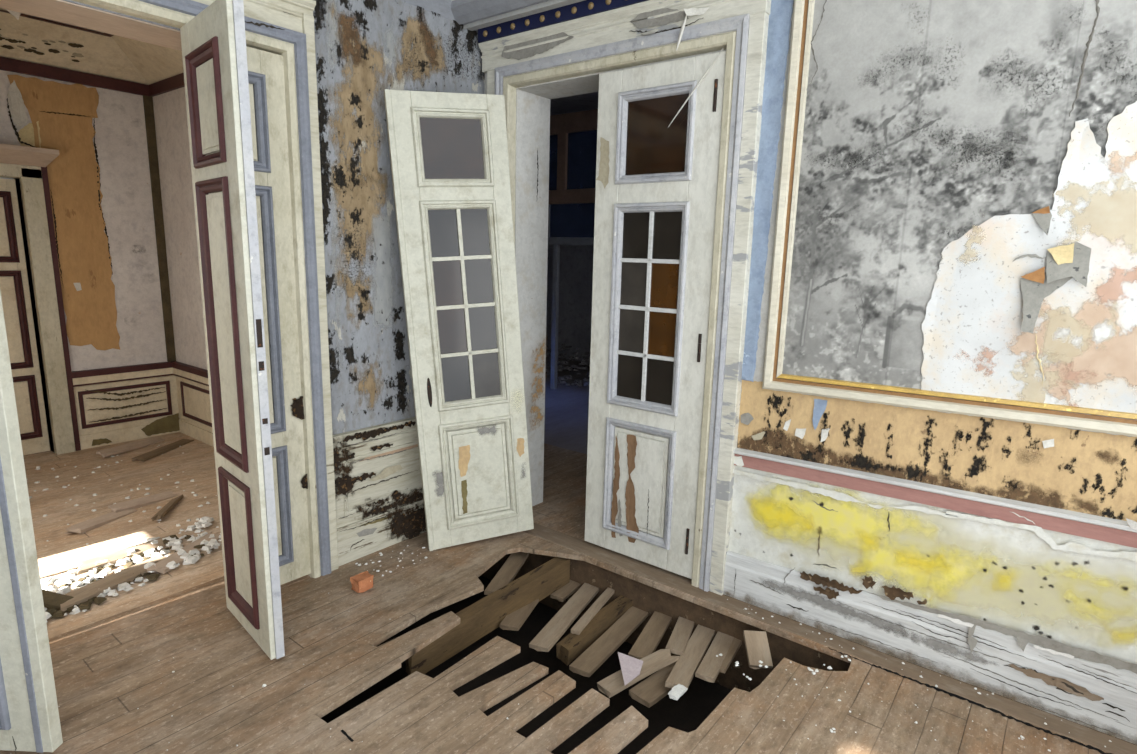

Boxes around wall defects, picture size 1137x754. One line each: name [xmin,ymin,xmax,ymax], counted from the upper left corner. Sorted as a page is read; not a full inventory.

peeling [0,29,84,62]
crack [811,0,827,83]
crack [1069,0,1100,117]
peeling [1032,205,1052,235]
peeling [1020,242,1091,333]
peeling [333,421,418,495]
spalling [357,472,444,540]
peeling [458,445,470,514]
peeling [478,425,496,435]
damp [752,486,984,593]
damp [737,395,1137,520]
peeling [750,567,1137,674]